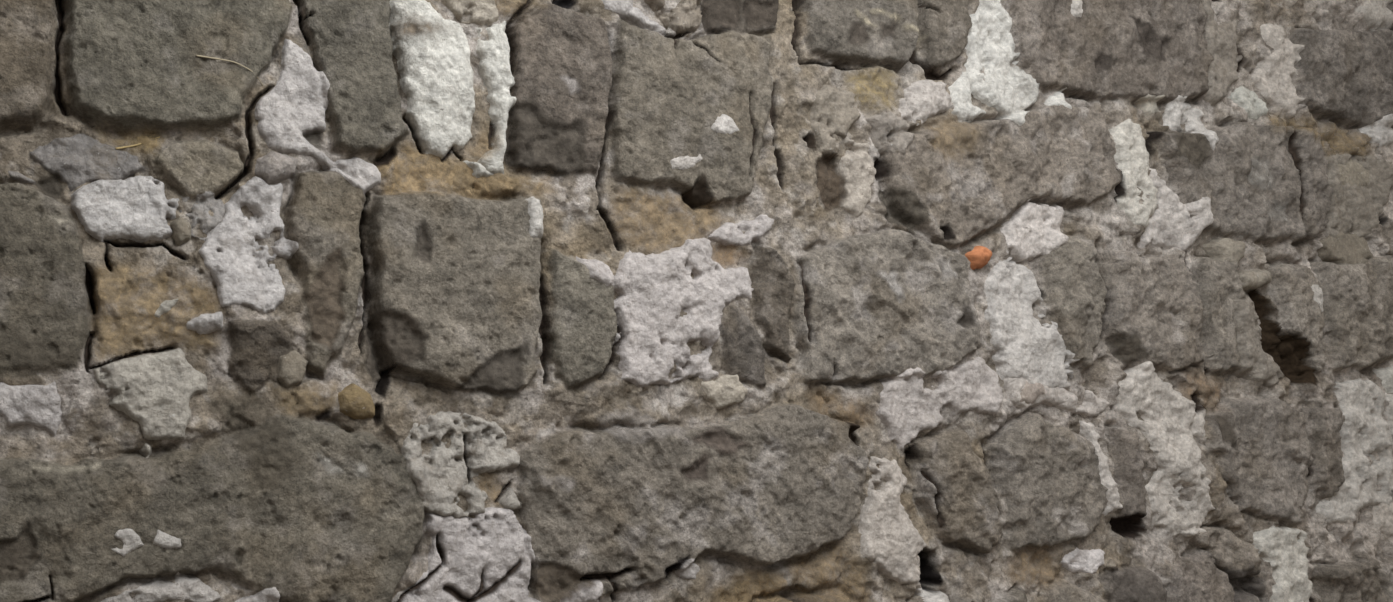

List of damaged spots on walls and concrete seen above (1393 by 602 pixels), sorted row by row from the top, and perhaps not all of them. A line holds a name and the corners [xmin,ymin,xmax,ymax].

crack [215,88,269,199]
crack [595,103,619,251]
crack [85,241,185,372]
crack [598,312,624,379]
crack [24,578,54,602]
crack [397,535,522,602]